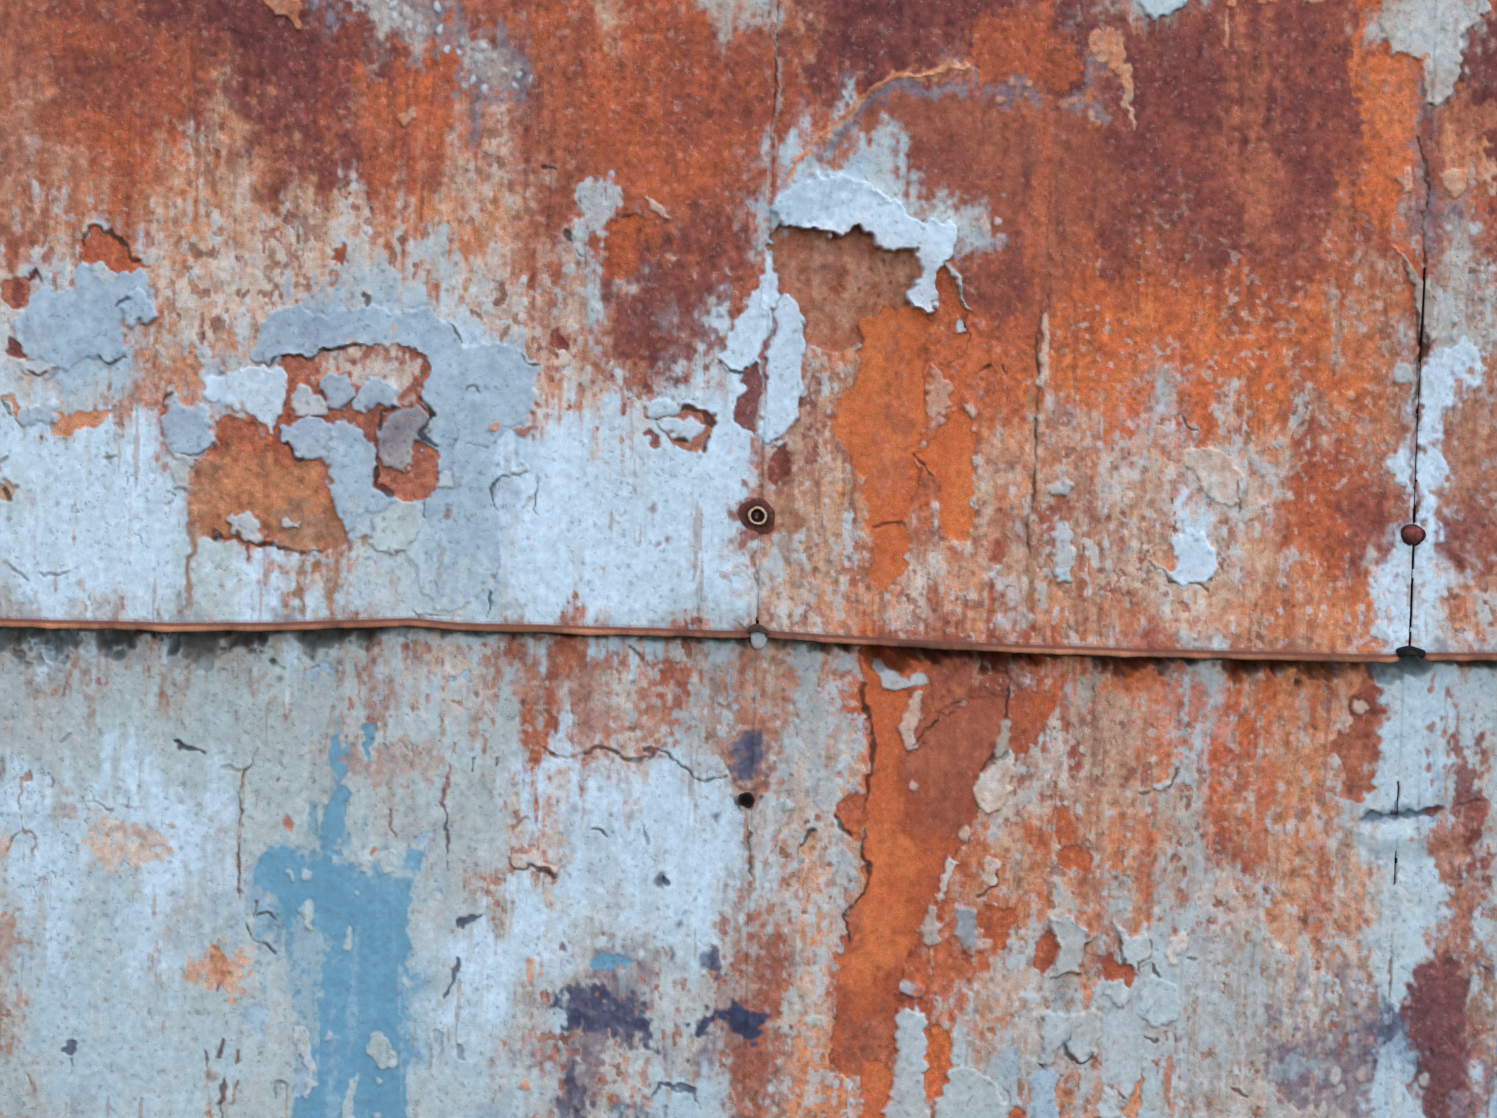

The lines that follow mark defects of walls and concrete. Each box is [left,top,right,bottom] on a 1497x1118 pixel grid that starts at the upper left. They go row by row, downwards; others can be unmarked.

rust [137,0,536,193]
rust [793,0,1431,366]
peeling [1378,0,1497,199]
peeling [0,222,160,437]
rust [611,200,761,450]
peeling [716,113,1038,592]
peeling [160,300,543,681]
rust [1320,377,1497,597]
crack [642,747,713,783]
peeling [828,645,1381,1118]
crack [1390,800,1442,818]
rust [1398,672,1497,1118]